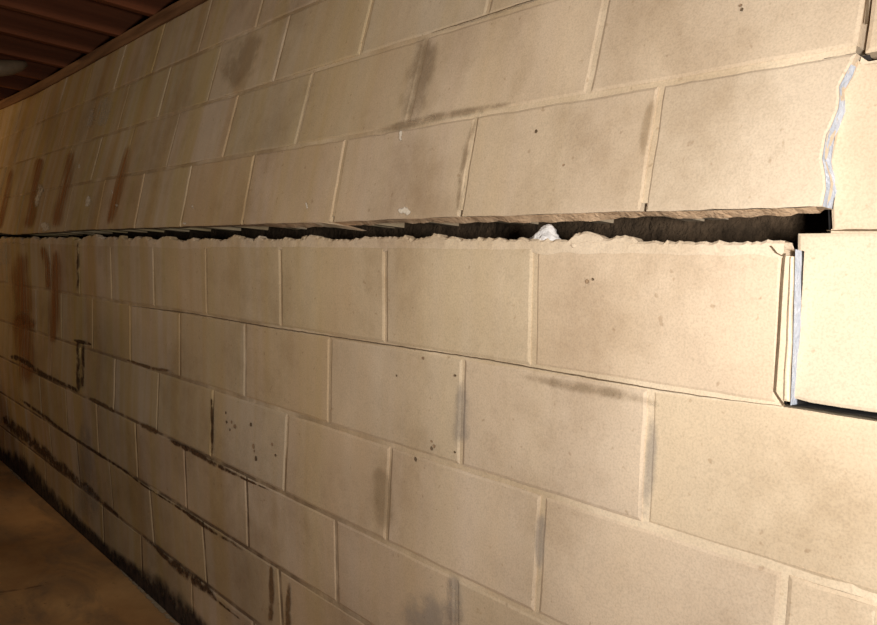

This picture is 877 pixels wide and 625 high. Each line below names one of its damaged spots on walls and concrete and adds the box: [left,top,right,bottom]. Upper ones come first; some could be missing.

crack [862,0,870,25]
crack [0,55,877,418]
water stain [11,340,91,391]
water stain [3,416,118,516]
water stain [24,402,235,545]
water stain [171,399,266,489]
water stain [0,449,205,625]
water stain [147,540,238,618]